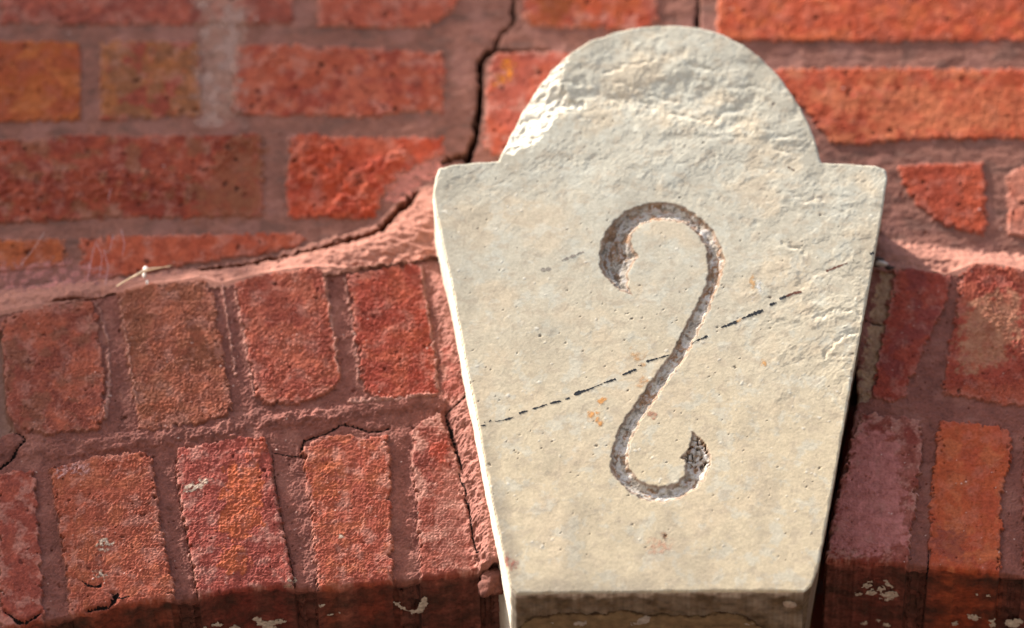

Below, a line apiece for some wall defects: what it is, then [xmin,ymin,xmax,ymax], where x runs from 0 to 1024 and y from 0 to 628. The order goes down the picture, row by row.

crack [445,0,549,165]
crack [197,190,419,271]
crack [52,295,99,303]
crack [692,291,802,344]
crack [481,355,668,426]
crack [272,423,389,591]
crack [445,393,479,553]
peeling [855,580,899,601]